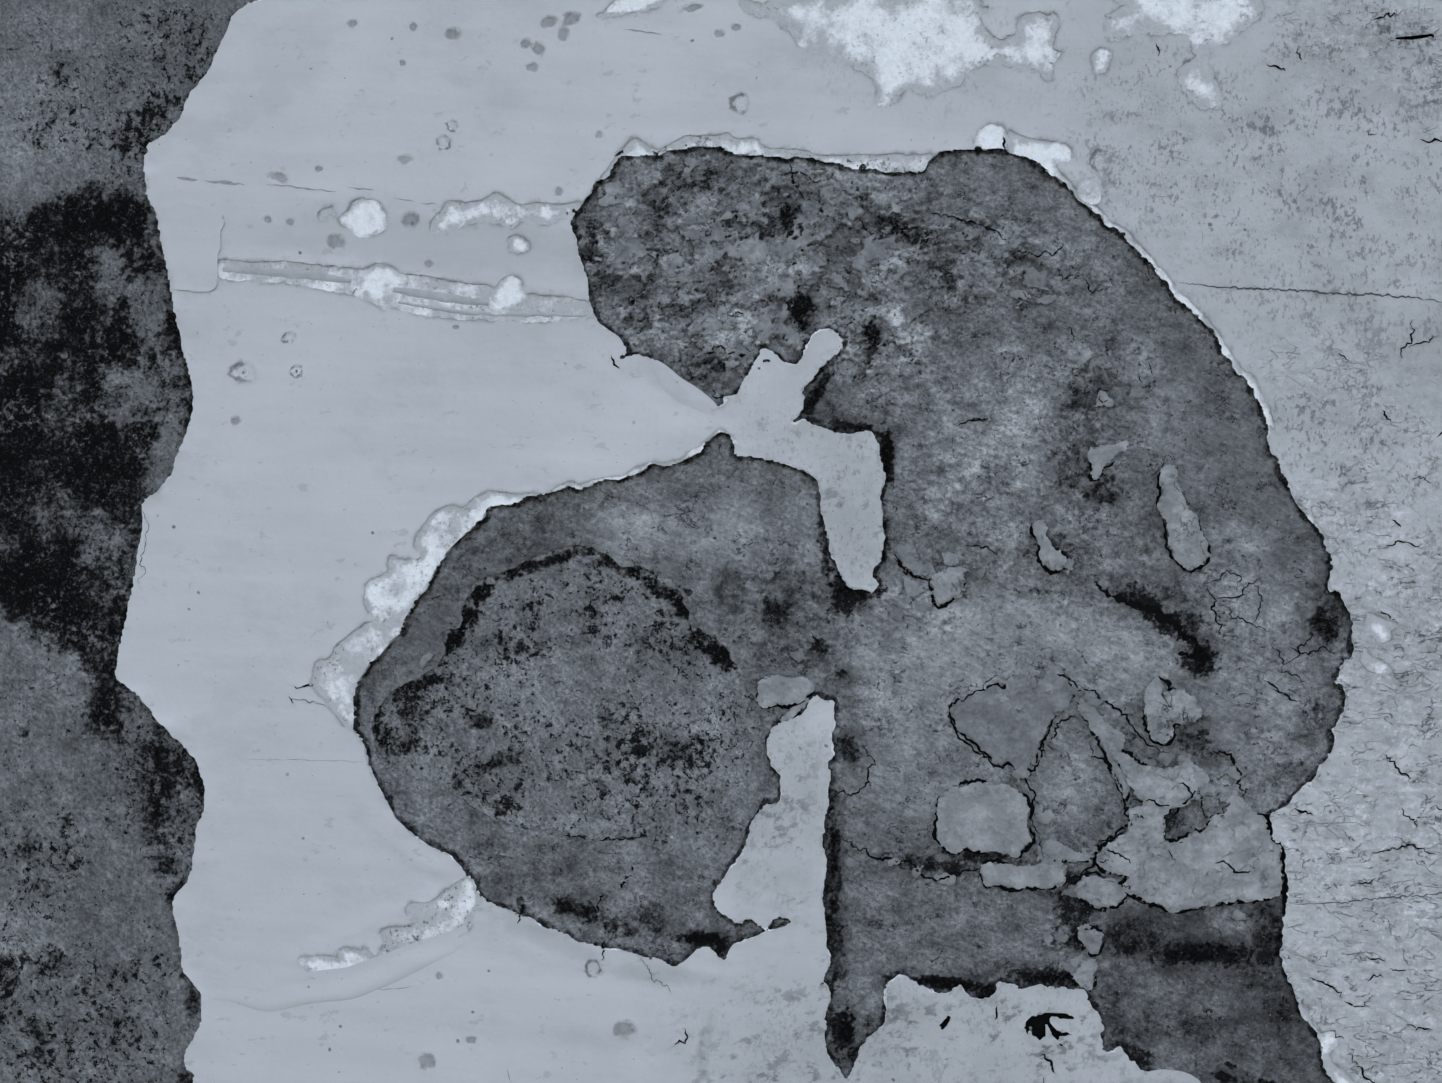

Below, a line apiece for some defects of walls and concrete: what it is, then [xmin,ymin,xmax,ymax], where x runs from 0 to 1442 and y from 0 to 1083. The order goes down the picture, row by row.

crack [1179,282,1441,357]
leakage [0,180,205,890]
peeling [0,0,258,1083]
leakage [373,545,741,765]
peeling [298,123,1397,1083]
crack [1094,570,1332,702]
crack [1386,520,1441,556]
leakage [479,746,522,773]
leakage [666,740,693,772]
crack [948,673,1442,914]
crack [1312,956,1406,1083]